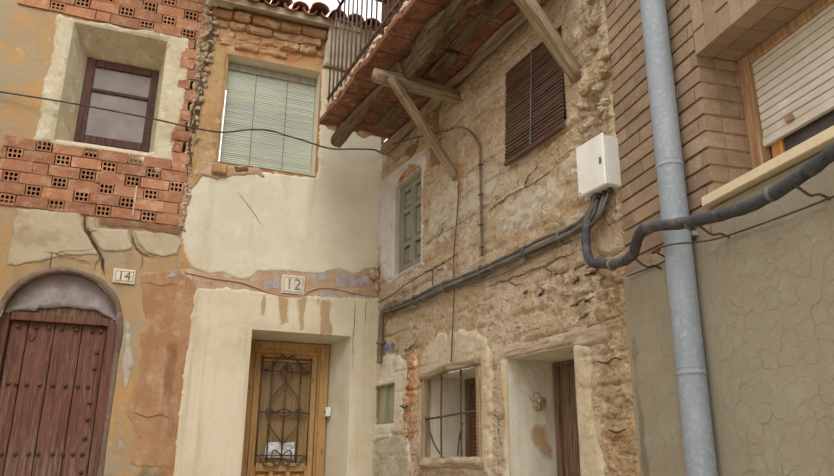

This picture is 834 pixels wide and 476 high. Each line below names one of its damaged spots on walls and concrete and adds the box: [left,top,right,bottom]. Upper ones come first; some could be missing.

crack [49,214,105,274]
crack [130,231,155,269]
flaking render [125,267,380,470]
crack [712,201,834,476]